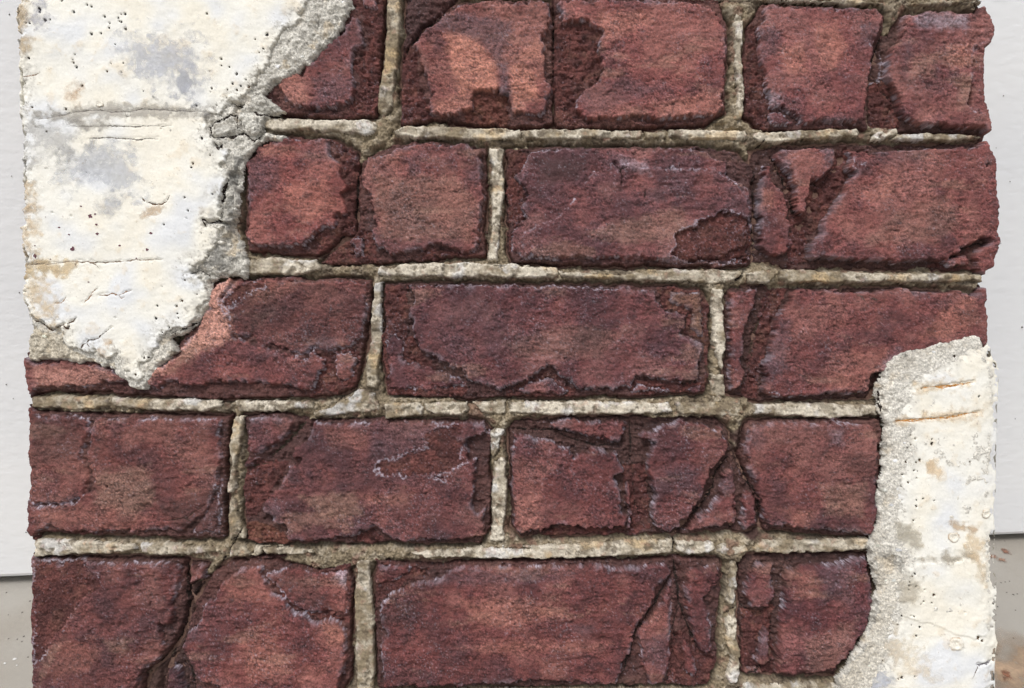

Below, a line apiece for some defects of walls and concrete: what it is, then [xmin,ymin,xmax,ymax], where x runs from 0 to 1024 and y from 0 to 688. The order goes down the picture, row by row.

spalling [221,0,385,119]
spalling [741,24,771,130]
spalling [866,81,901,129]
spalling [184,155,244,295]
spalling [671,211,752,263]
spalling [777,146,850,269]
spalling [130,300,183,384]
spalling [630,286,710,396]
spalling [376,425,465,477]
spalling [542,463,650,536]
spalling [837,336,982,688]
crack [152,526,244,687]